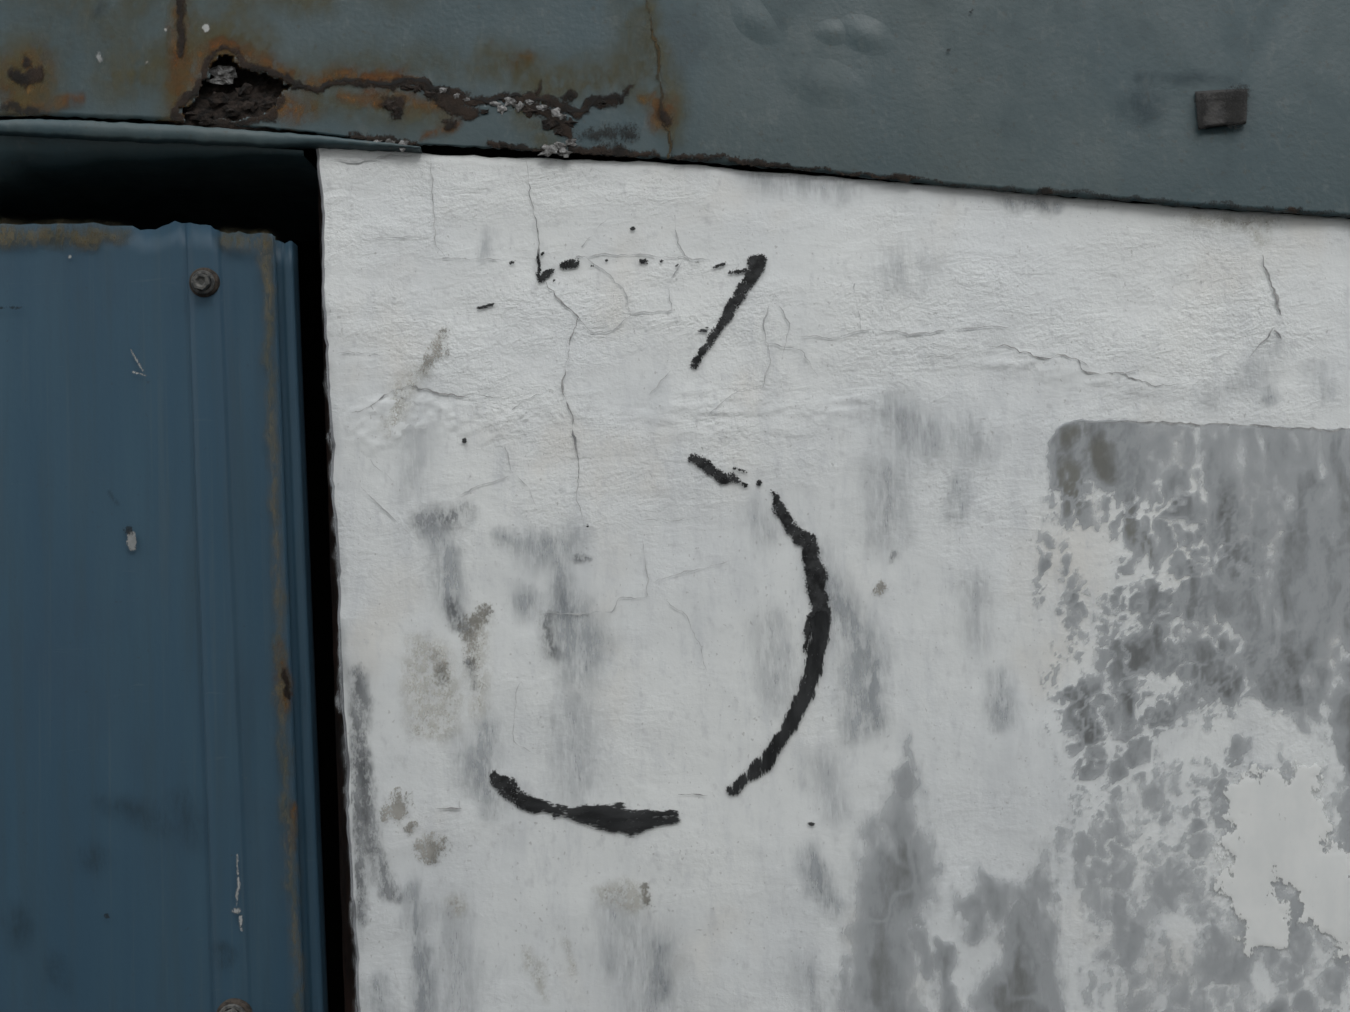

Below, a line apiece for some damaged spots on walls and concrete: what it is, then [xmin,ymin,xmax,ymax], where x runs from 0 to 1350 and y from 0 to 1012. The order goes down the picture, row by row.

corrosion [0,49,83,116]
corrosion [170,0,187,94]
corrosion [348,123,459,146]
corrosion [487,0,1350,217]
crack [348,161,710,535]
leakage [327,431,339,582]
leakage [416,510,493,664]
leakage [539,539,595,657]
leakage [336,620,370,924]
peeling [1033,419,1350,1012]
leakage [839,736,1064,1012]